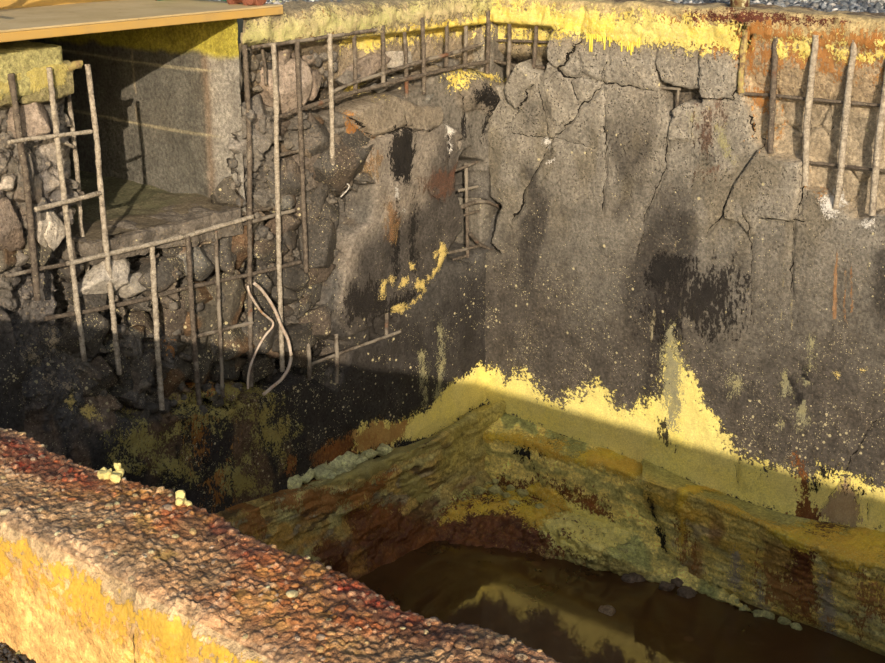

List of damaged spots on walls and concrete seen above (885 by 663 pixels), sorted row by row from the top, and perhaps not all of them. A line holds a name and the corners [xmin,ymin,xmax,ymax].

spalling [0,10,554,420]
crack [349,34,658,220]
crack [635,121,671,258]
crack [697,35,741,100]
crack [707,164,805,322]
crack [749,115,766,149]
corrosion [654,7,885,155]
spalling [737,20,885,216]
damp [351,249,885,532]
corrosion [170,412,615,579]